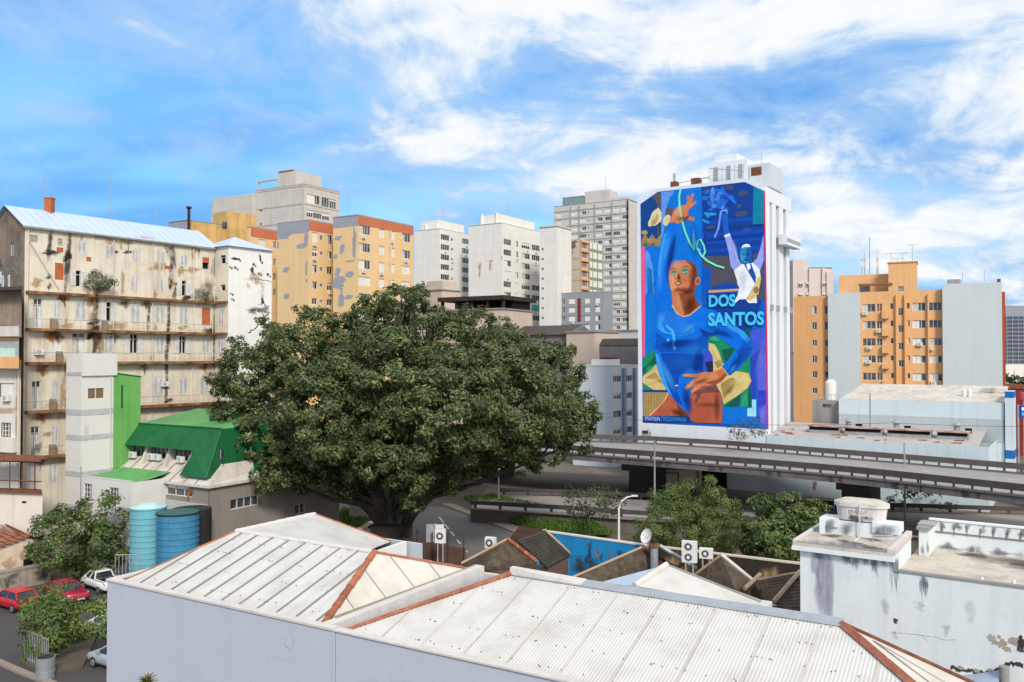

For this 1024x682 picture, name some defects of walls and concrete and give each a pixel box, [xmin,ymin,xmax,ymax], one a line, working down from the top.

water stain [43,236,72,280]
peeling [229,254,271,306]
peeling [277,232,309,282]
peeling [332,228,356,307]
water stain [811,516,898,615]
flaking render [951,634,1024,674]